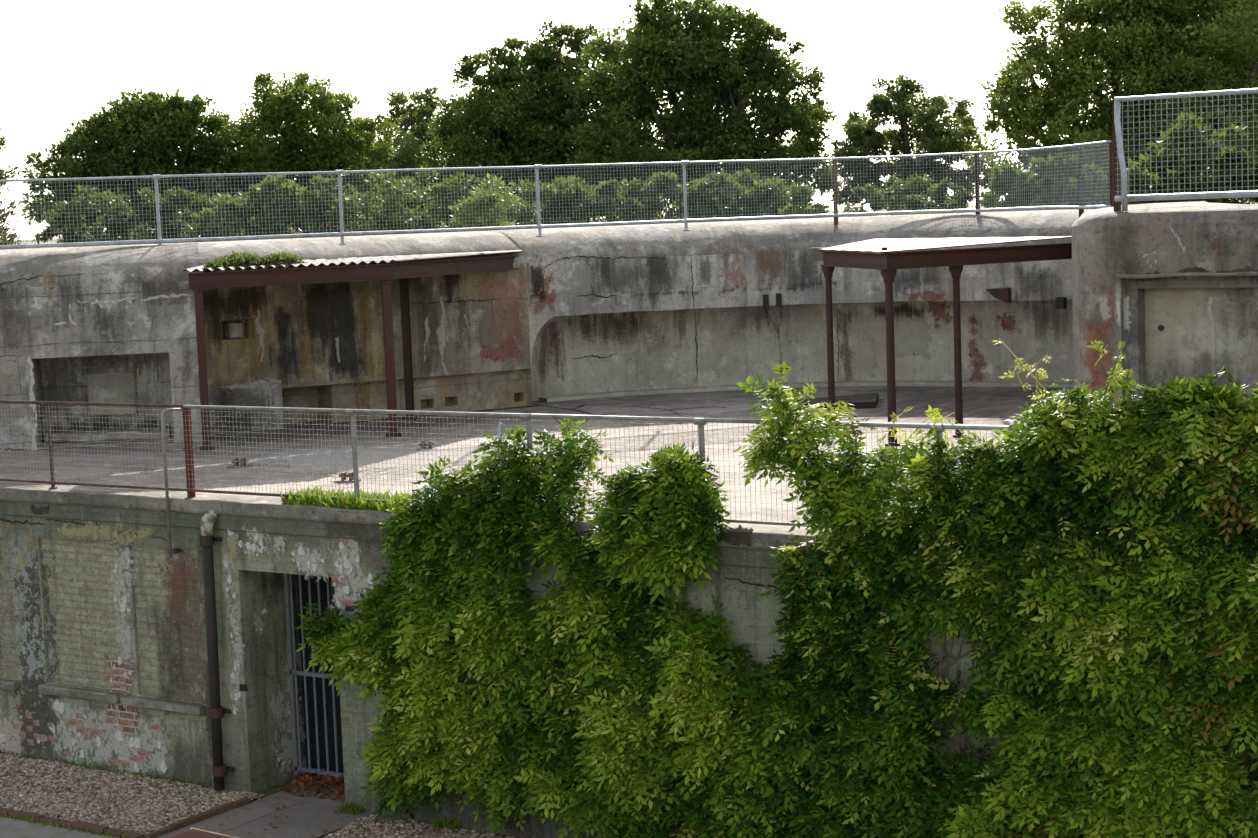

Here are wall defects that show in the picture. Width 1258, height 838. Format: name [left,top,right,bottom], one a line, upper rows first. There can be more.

crack [0,273,96,291]
leakage [30,271,387,409]
crack [411,255,727,421]
spalling [1137,266,1258,281]
spalling [0,538,175,782]
peeling [268,649,307,785]
peeling [219,527,400,716]